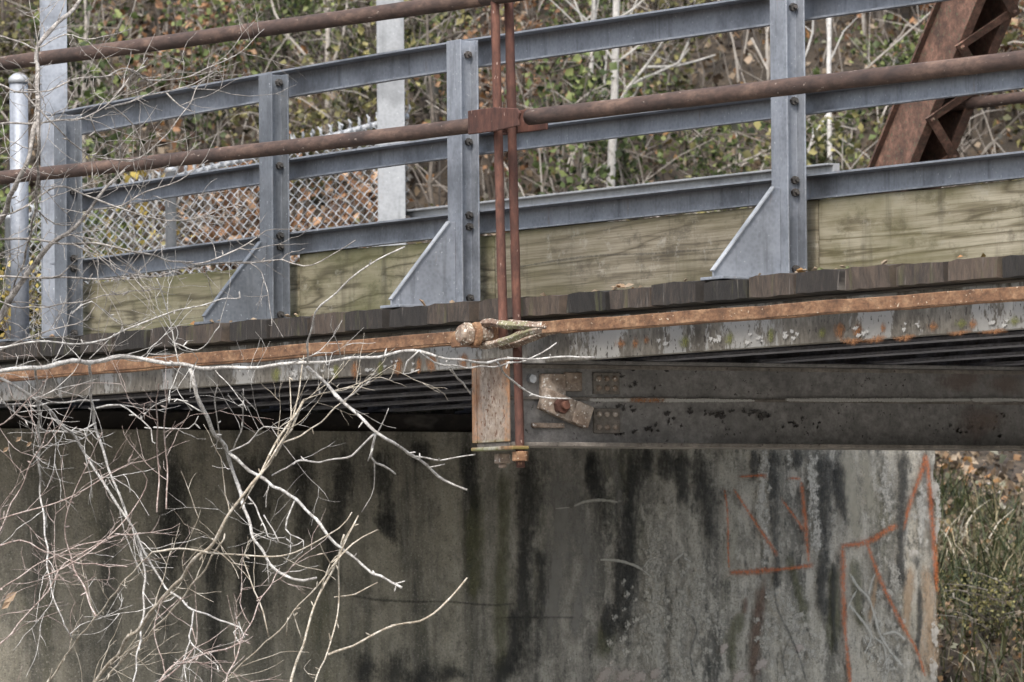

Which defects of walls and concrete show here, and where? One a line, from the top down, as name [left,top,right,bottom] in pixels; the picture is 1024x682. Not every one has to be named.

damp [157,465,191,581]
damp [206,458,274,662]
damp [292,451,313,539]
damp [323,448,354,582]
damp [372,448,396,543]
damp [414,443,429,461]
damp [460,451,483,596]
damp [491,457,546,682]
damp [594,450,719,682]
damp [750,451,846,651]
damp [896,454,919,586]
damp [357,649,464,682]